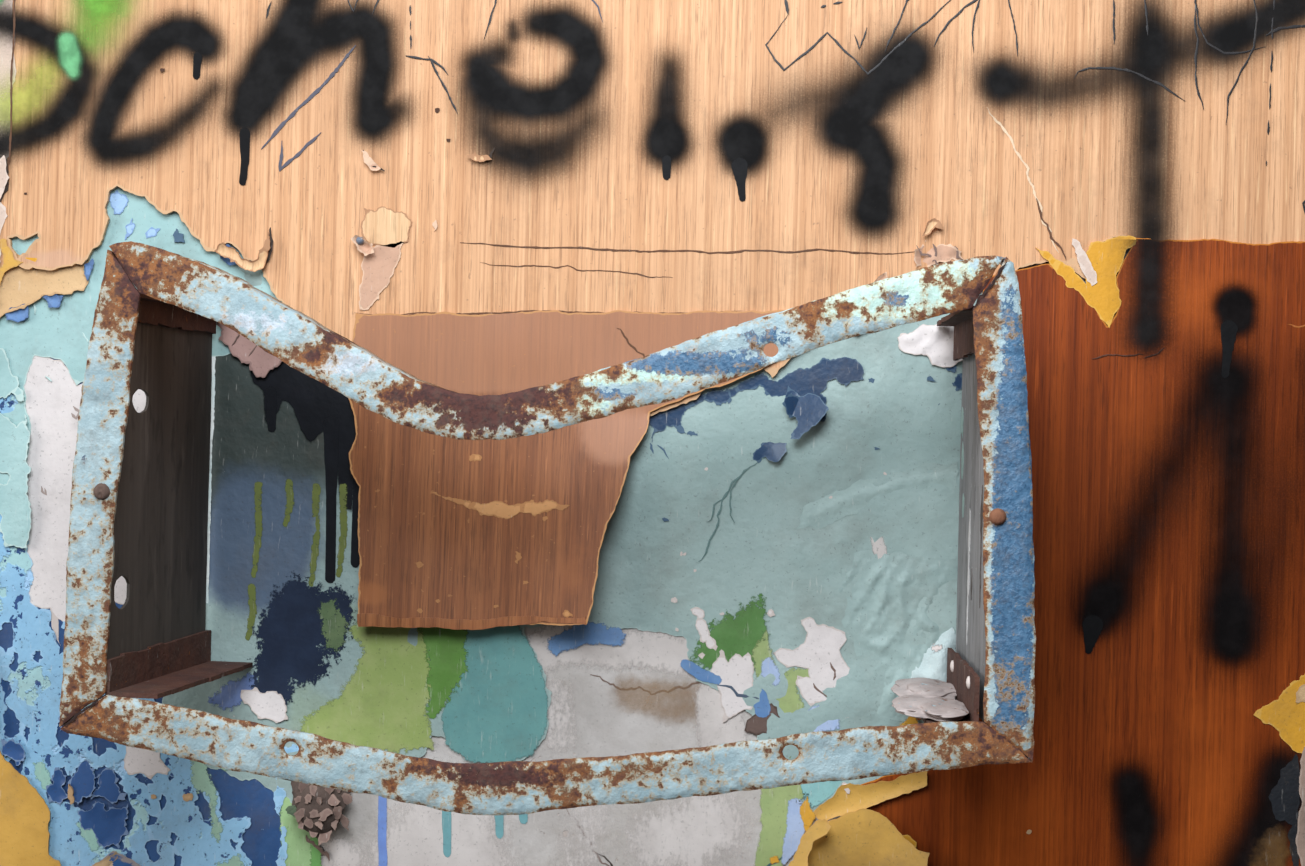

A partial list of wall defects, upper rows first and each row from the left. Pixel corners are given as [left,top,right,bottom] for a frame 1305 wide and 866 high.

crack [987,107,1066,259]
peeling [359,206,412,310]
crack [460,242,910,278]
flaking render [132,389,146,413]
peeling [649,357,875,463]
flaking render [0,348,82,646]
crack [700,458,765,561]
flaking render [114,576,127,605]
flaking render [671,597,780,735]
flaking render [773,617,850,706]
peeling [46,746,170,849]
crack [567,810,613,866]